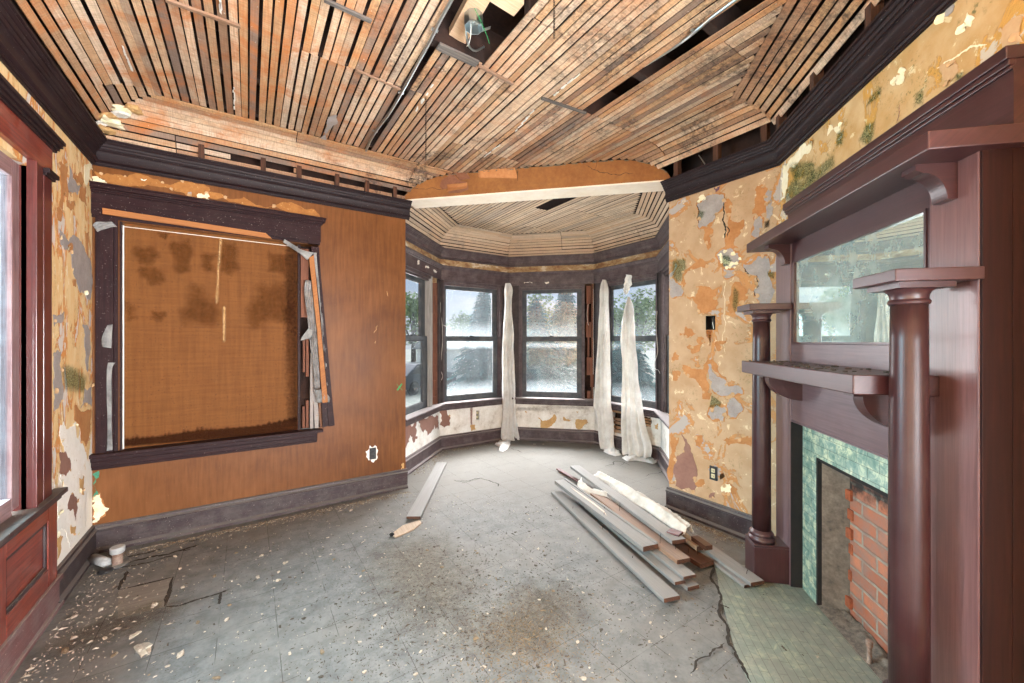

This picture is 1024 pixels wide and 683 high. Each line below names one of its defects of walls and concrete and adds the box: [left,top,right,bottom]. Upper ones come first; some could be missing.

peeling [934,4,954,25]
damp [786,158,834,199]
peeling [57,162,320,300]
crack [697,203,730,238]
peeling [669,141,812,314]
damp [64,368,85,390]
peeling [672,327,744,422]
peeling [53,323,109,560]
peeling [406,410,451,446]
peeling [667,434,738,499]
crack [114,539,199,570]
crack [691,565,751,682]